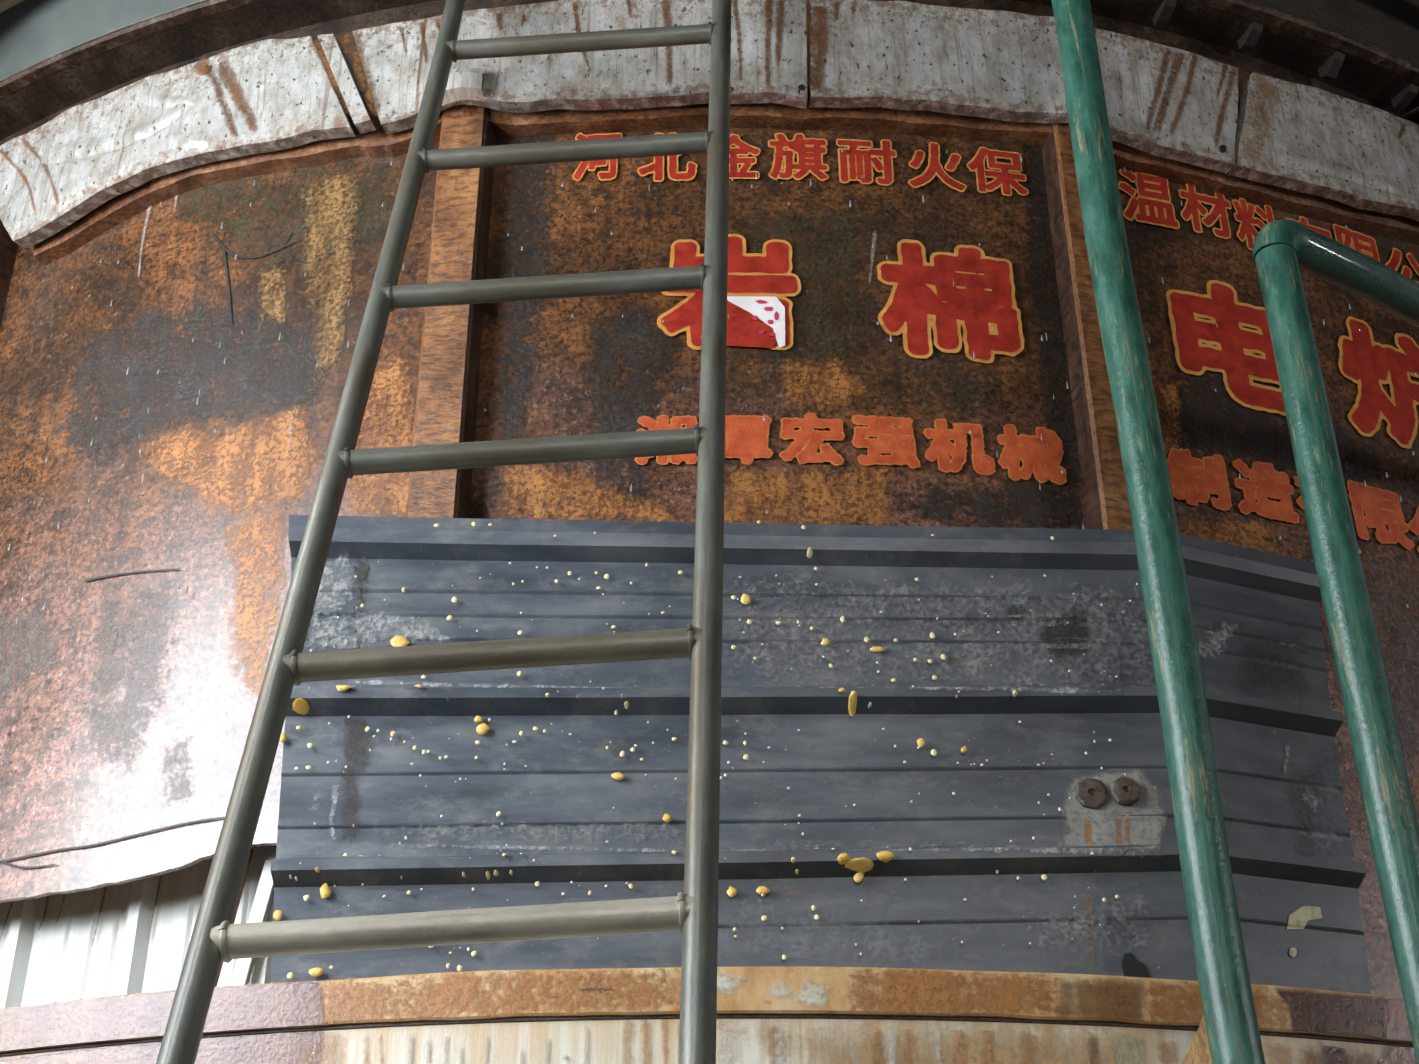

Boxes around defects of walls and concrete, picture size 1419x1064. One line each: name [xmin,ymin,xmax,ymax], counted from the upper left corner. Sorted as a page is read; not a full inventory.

corrosion [195,59,257,135]
corrosion [312,34,380,115]
corrosion [432,103,709,144]
corrosion [730,0,1070,149]
corrosion [1112,140,1419,246]
corrosion [33,127,414,375]
corrosion [355,357,415,449]
corrosion [347,472,410,517]
corrosion [498,465,674,522]
corrosion [724,466,891,525]
corrosion [145,407,316,696]
corrosion [0,990,176,1064]